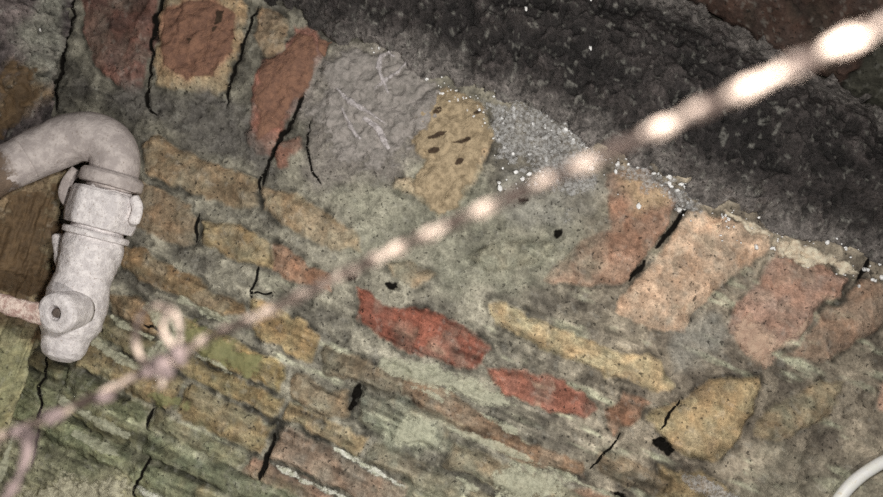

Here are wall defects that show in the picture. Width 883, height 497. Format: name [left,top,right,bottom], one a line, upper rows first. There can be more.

crack [145,0,164,116]
crack [226,8,259,109]
crack [258,93,321,193]
crack [31,356,48,467]
crack [132,457,151,497]
efflorescence [276,465,346,497]
efflorescence [334,447,404,488]